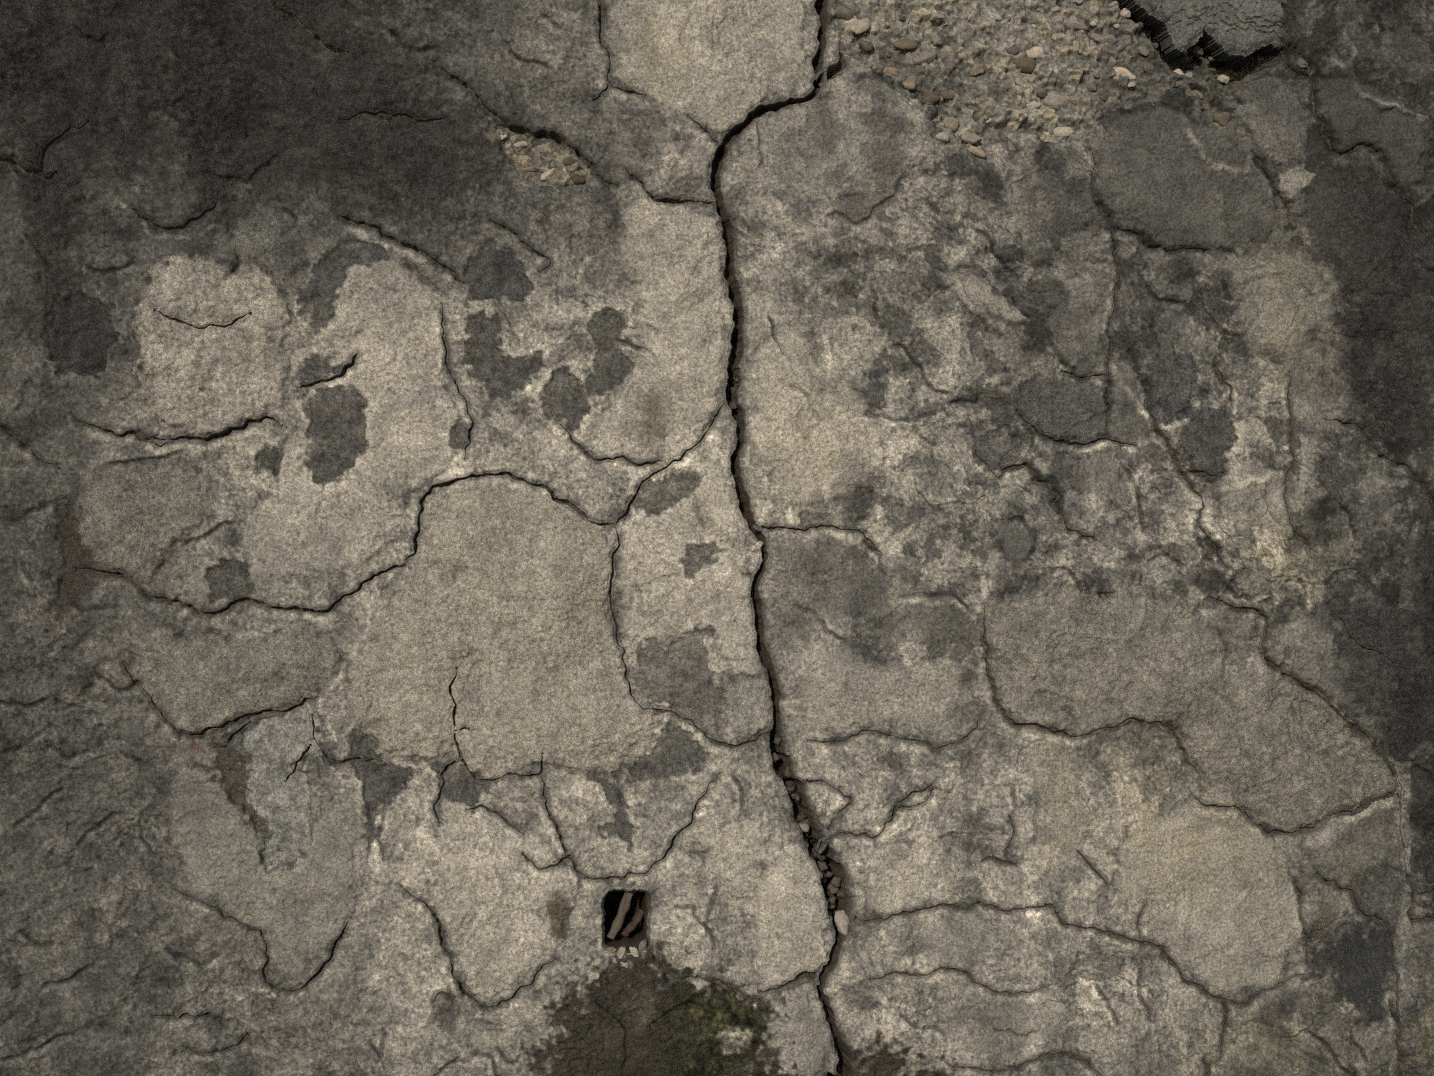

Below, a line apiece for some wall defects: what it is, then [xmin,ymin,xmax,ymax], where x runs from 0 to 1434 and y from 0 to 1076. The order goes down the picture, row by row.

crack [0,120,90,181]
spalling [829,0,1309,158]
crack [1251,150,1292,216]
crack [1278,39,1428,239]
crack [0,424,59,470]
crack [69,0,938,1076]
crack [973,149,1231,570]
crack [1213,362,1236,411]
crack [1281,372,1434,550]
crack [808,595,1434,930]
crack [855,878,1313,1076]
crack [1391,963,1405,1076]